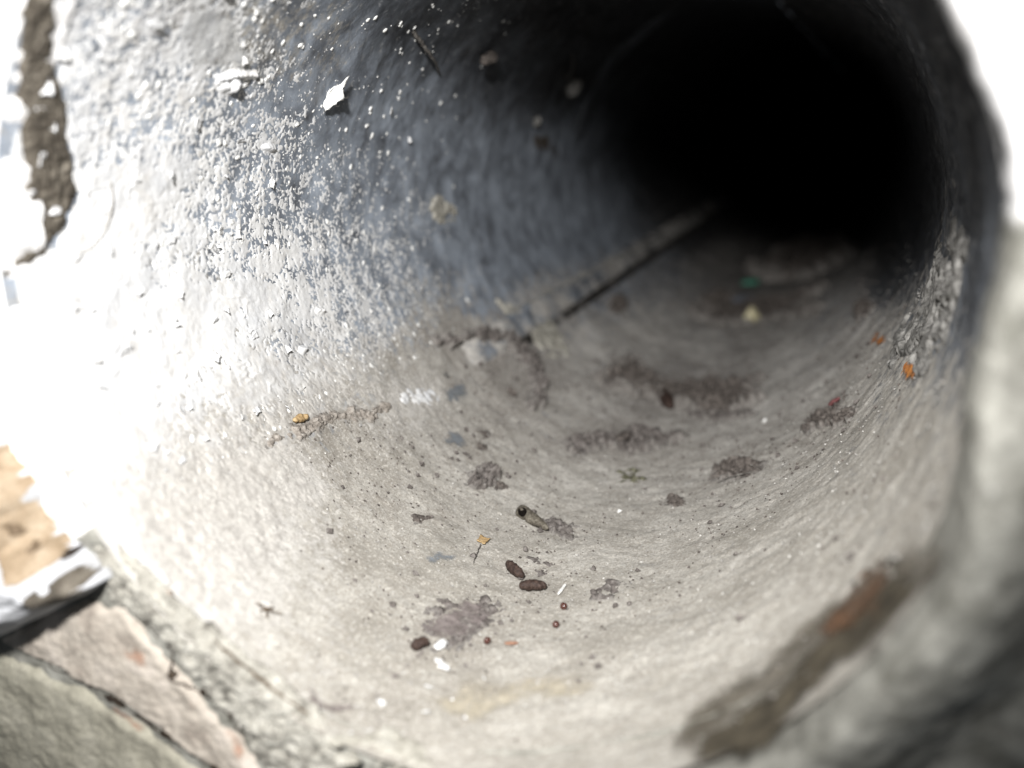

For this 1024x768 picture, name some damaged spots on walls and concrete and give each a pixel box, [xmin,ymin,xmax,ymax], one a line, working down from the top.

peeling [0,0,529,675]